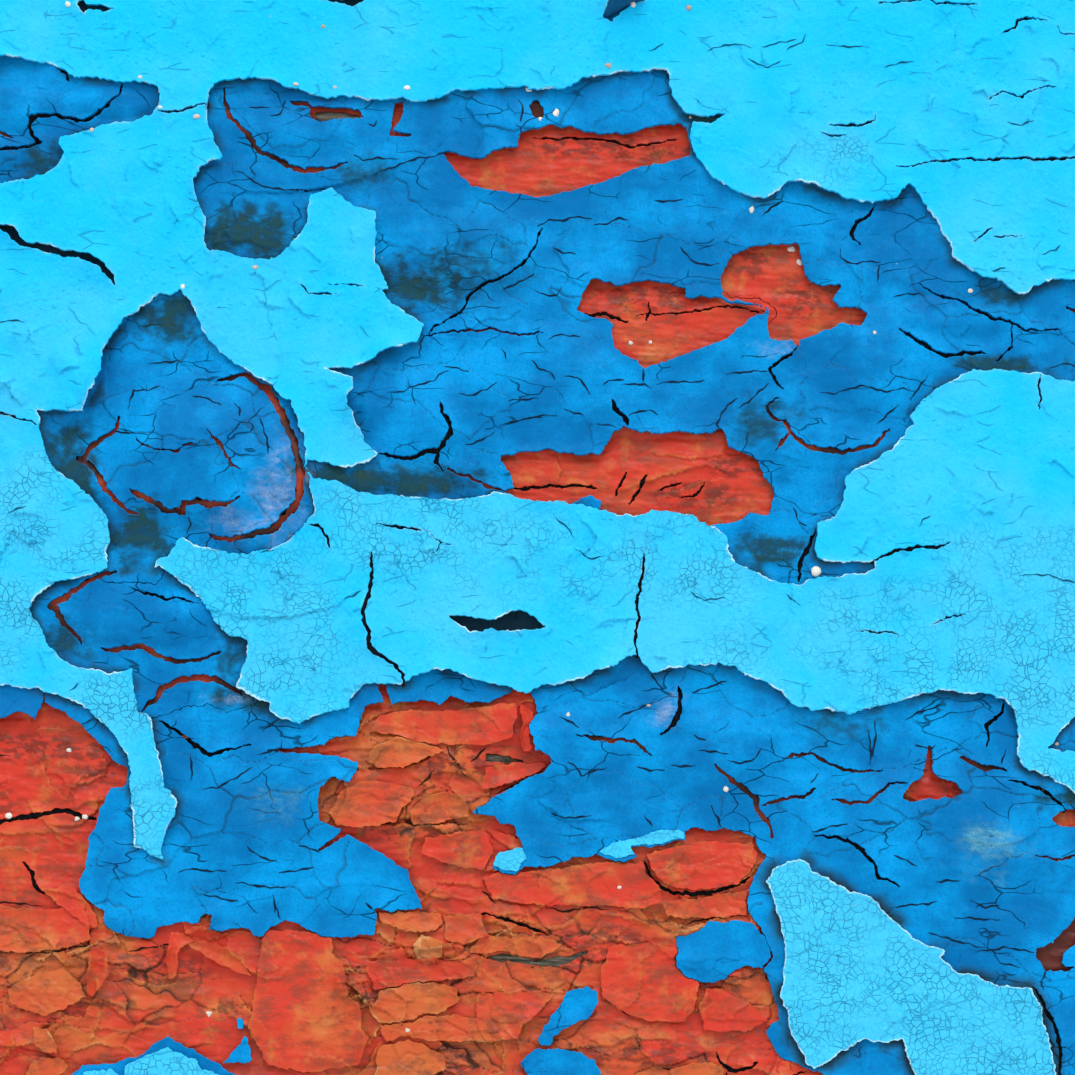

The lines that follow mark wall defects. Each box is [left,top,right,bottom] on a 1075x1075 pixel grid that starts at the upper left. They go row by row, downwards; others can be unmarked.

peeling [0,55,160,183]
crack [907,157,1075,167]
peeling [30,69,1075,719]
crack [381,524,449,553]
crack [345,553,405,687]
peeling [365,703,546,790]
crack [559,554,1075,1075]
peeling [903,746,962,802]
peeling [1048,717,1075,752]
peeling [1052,803,1075,827]
peeling [0,781,771,1075]
peeling [1036,918,1075,972]